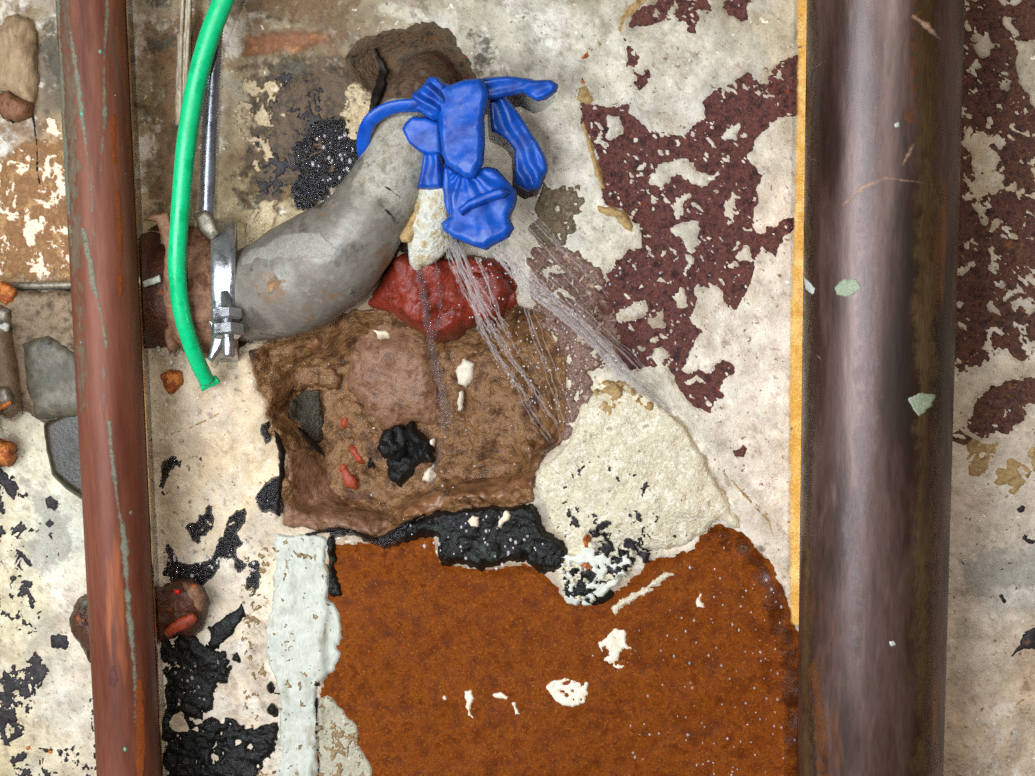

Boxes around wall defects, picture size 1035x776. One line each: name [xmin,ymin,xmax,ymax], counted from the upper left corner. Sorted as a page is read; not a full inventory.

peeling [0,117,69,282]
leakage [233,55,359,213]
leakage [0,468,70,634]
leakage [0,652,96,776]
leakage [50,634,69,650]
leakage [107,421,117,496]
leakage [119,514,145,776]
leakage [159,455,182,496]
leakage [160,476,284,776]
leakage [260,421,272,445]
leakage [327,0,816,776]
corrosion [593,380,654,416]